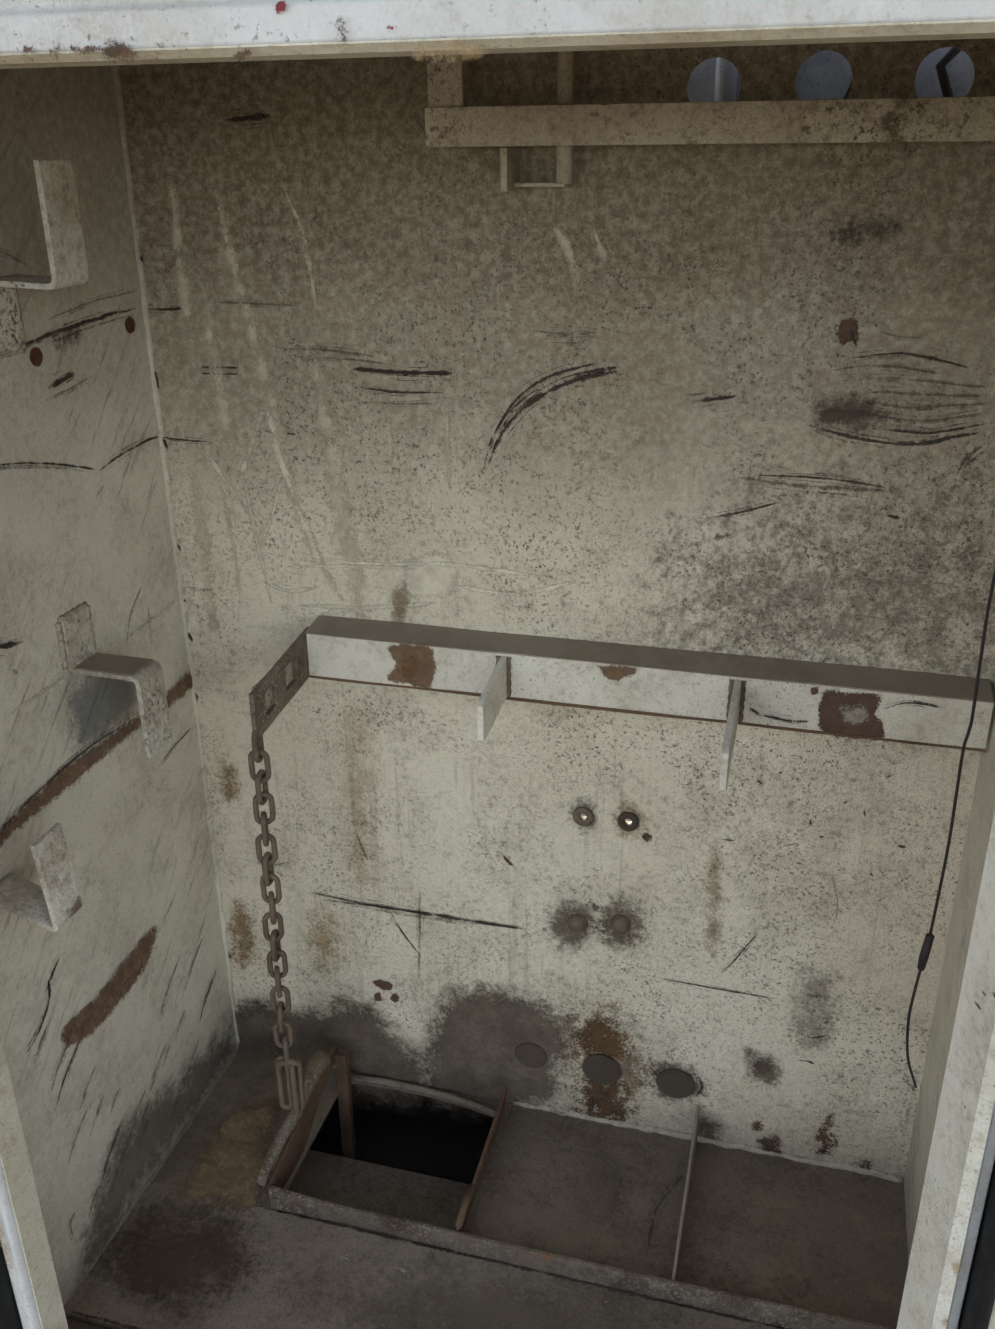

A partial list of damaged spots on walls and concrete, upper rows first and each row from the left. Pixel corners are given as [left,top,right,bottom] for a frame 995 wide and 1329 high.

corrosion [388,643,437,688]
corrosion [818,689,886,741]
water stain [545,894,646,950]
corrosion [564,1001,657,1123]